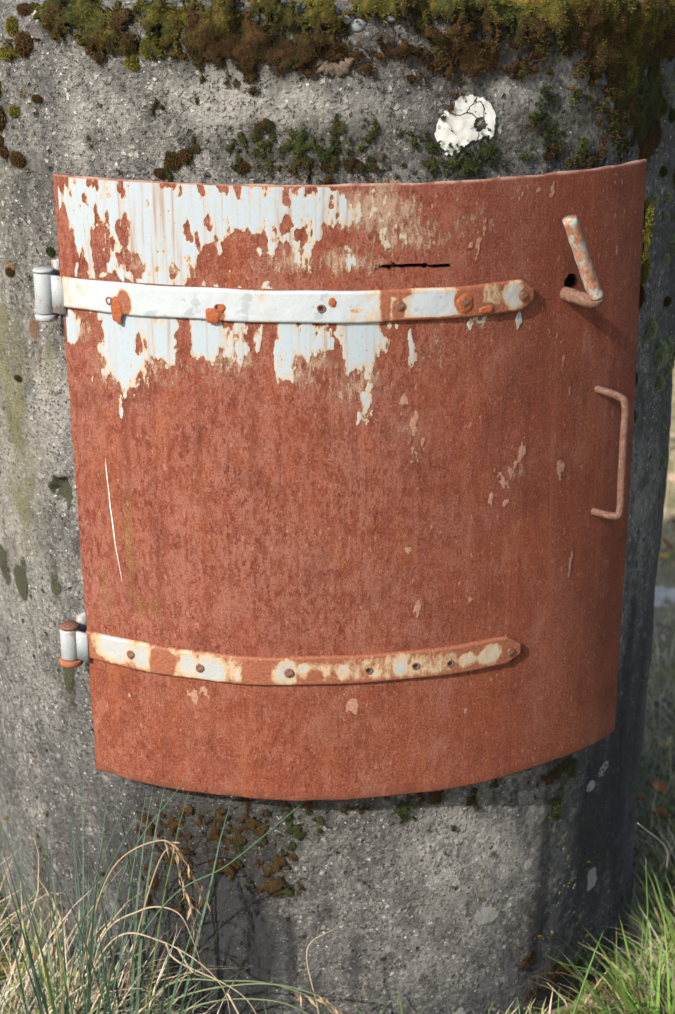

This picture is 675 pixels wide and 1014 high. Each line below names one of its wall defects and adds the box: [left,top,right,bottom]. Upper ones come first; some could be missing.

peeling [58,177,440,289]
peeling [463,212,494,260]
rust [111,296,123,325]
rust [205,304,226,324]
rust [457,293,494,314]
peeling [463,316,488,330]
peeling [66,309,263,419]
peeling [273,322,417,426]
water stain [532,797,550,943]